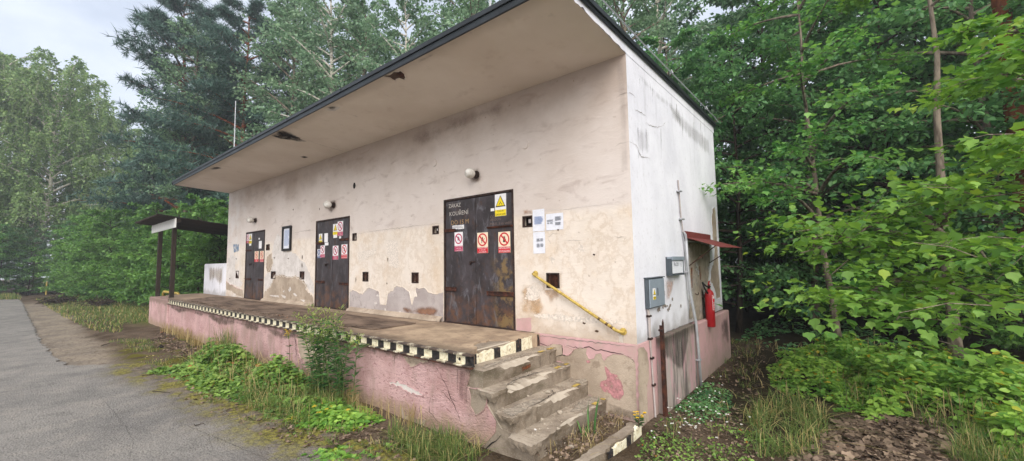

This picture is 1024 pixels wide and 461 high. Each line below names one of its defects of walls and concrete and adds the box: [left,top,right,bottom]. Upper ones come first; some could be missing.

spalling [383,70,408,81]
peeling [264,233,315,306]
peeling [349,283,444,321]
crack [504,336,633,407]
peeling [547,343,649,424]